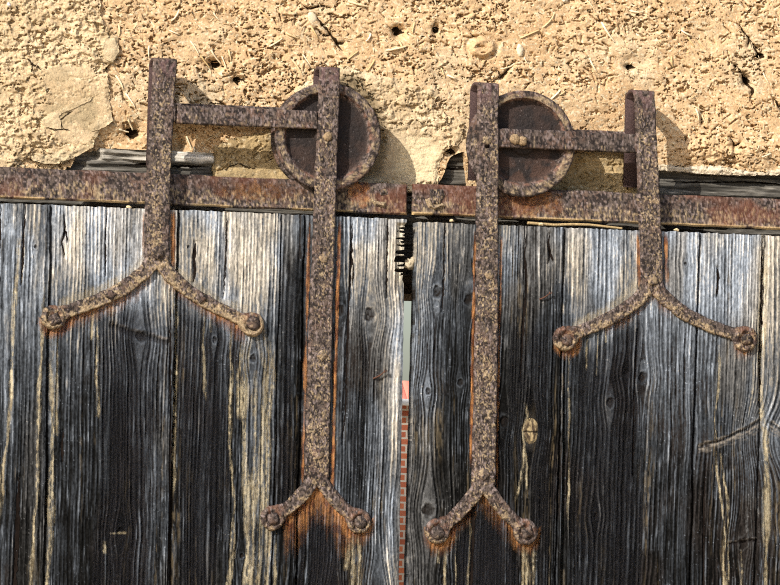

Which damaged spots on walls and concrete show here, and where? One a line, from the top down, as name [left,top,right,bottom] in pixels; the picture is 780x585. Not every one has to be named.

crack [302,4,344,50]
crack [739,25,762,54]
peeling [0,0,120,167]
crack [734,65,754,97]
rust [331,260,340,484]
rust [286,488,344,524]